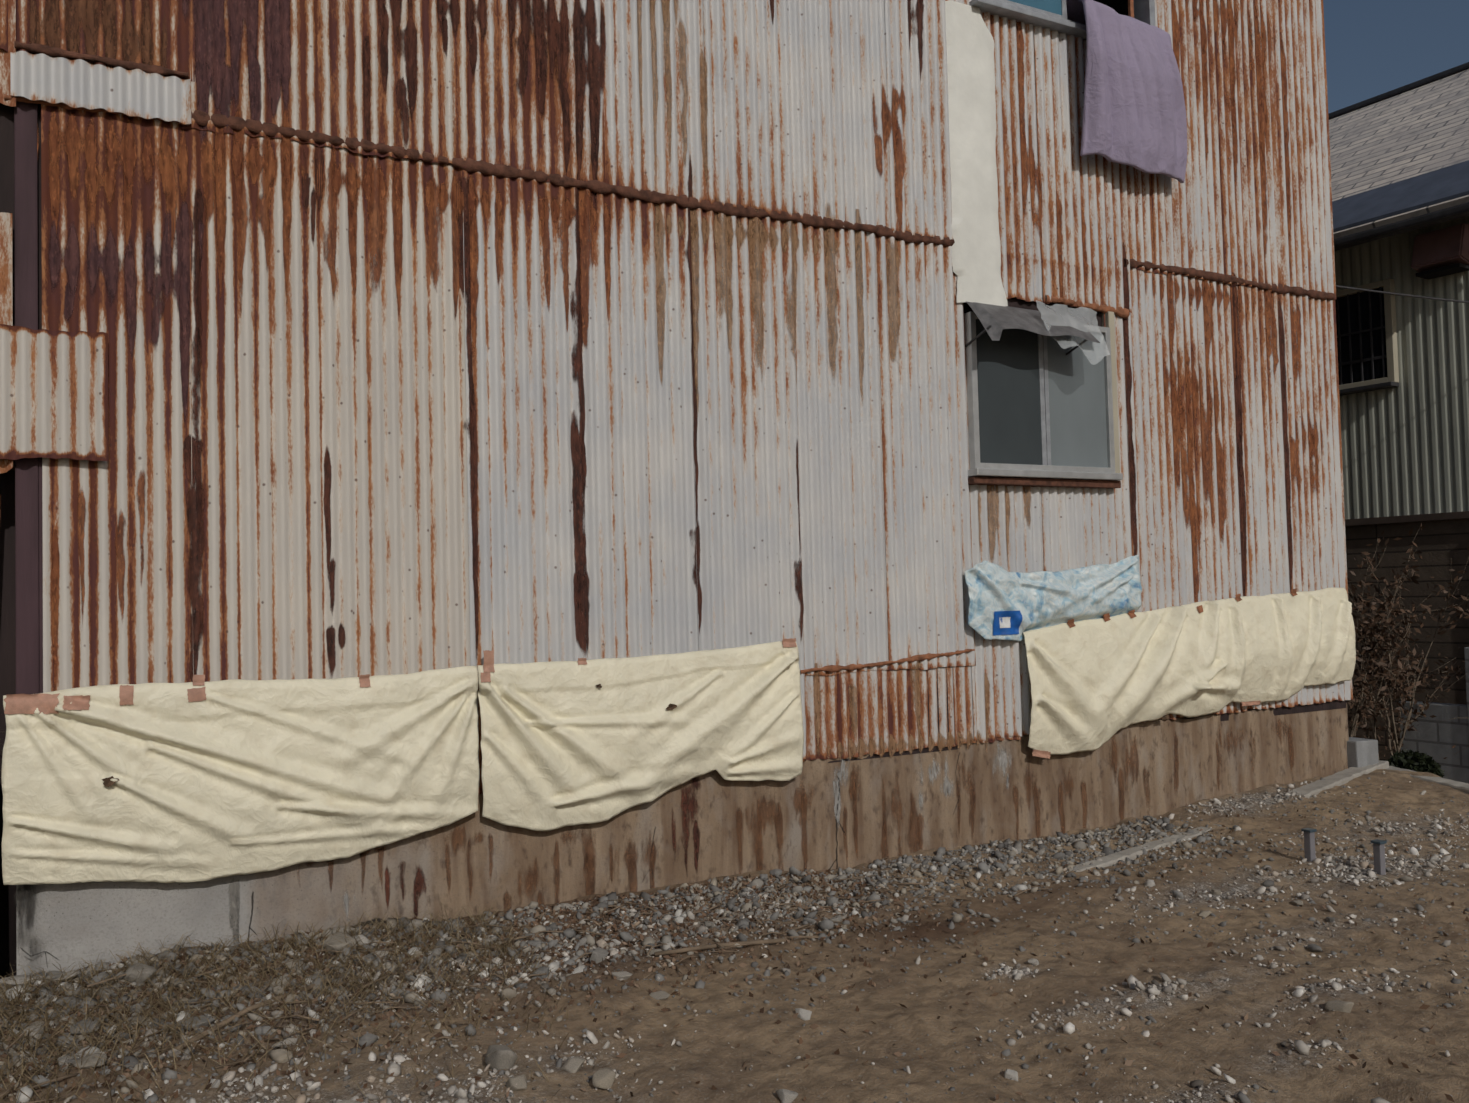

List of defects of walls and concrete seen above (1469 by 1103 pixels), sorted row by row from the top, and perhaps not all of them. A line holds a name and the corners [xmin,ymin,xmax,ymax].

rust [29,0,417,691]
rust [437,0,487,76]
rust [425,175,502,658]
rust [508,0,619,653]
rust [637,0,864,638]
rust [873,85,906,360]
rust [1012,21,1063,307]
rust [1123,243,1323,602]
rust [1172,0,1292,277]
rust [360,845,426,918]
rust [504,777,700,911]
rust [813,661,990,860]